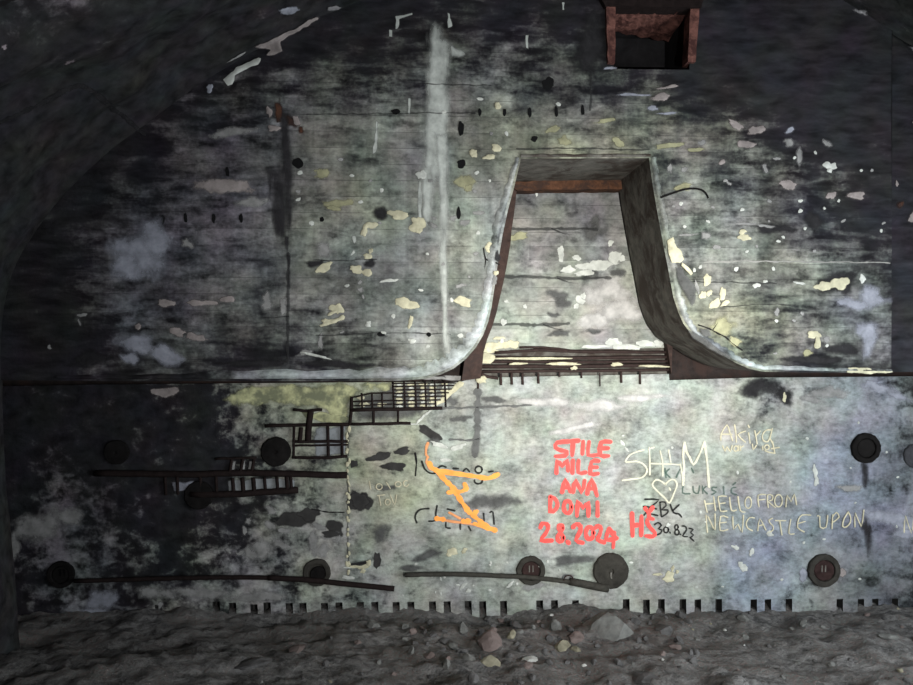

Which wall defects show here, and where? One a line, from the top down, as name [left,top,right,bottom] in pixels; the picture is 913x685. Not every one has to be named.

peeling [280,7,298,15]
peeling [256,17,318,56]
leakage [418,13,464,353]
leakage [268,170,290,266]
flaking render [387,210,437,234]
flaking render [736,222,774,241]
flaking render [350,248,398,292]
flaking render [453,284,471,307]
flaking render [793,274,866,291]
flaking render [395,297,420,344]
spalling [483,319,581,370]
flaking render [803,331,829,356]